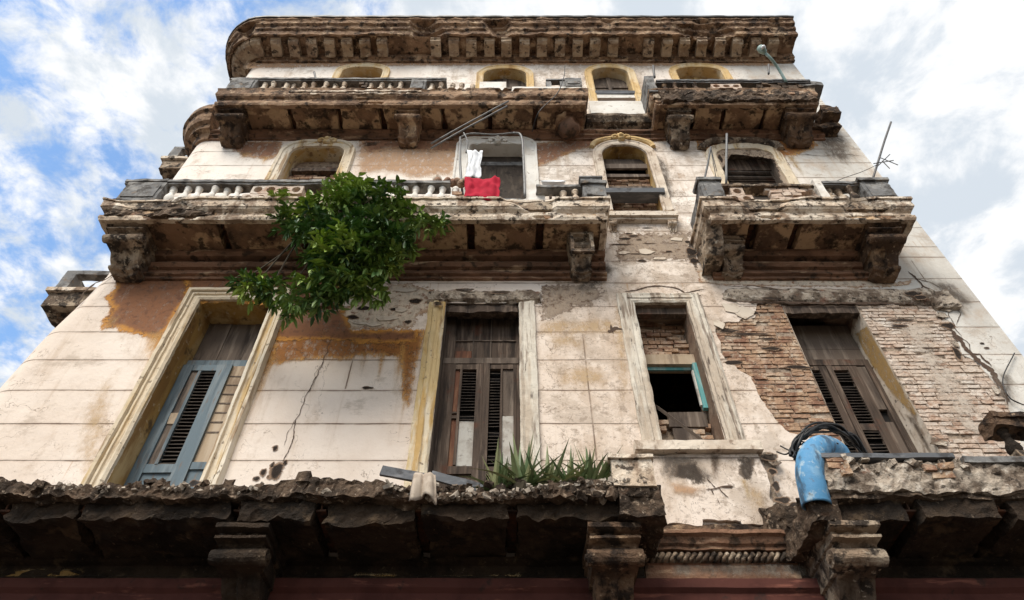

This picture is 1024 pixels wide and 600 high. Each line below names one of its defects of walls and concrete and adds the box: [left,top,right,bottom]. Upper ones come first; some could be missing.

corrosion [100,280,252,350]
crack [283,340,331,461]
corrosion [266,281,425,405]
peeling [612,227,911,289]
spalling [713,303,843,443]
spalling [854,304,1020,479]
crack [948,312,1020,404]
leakage [661,455,718,493]